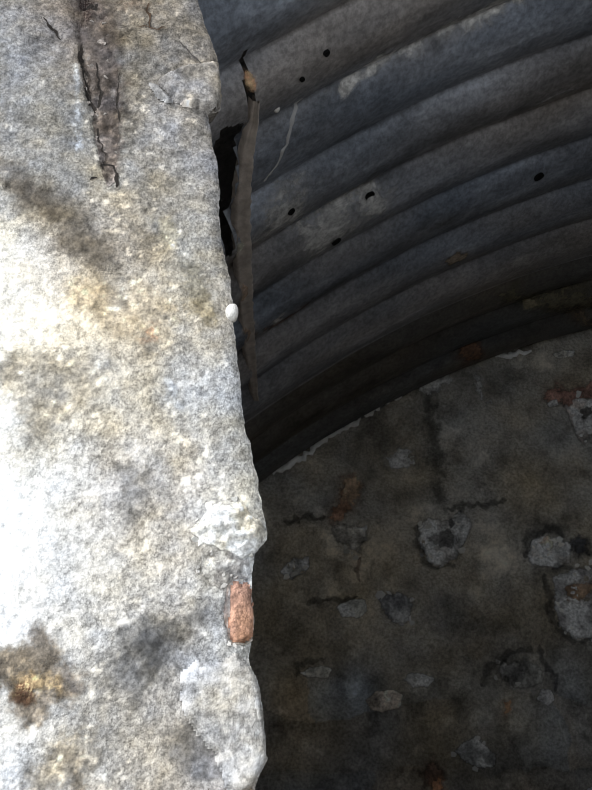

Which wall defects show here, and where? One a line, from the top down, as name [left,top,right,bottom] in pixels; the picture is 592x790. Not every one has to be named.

leakage [73,65,81,151]
crack [43,3,120,187]
flaking render [544,381,592,443]
flaking render [417,512,471,567]
flaking render [528,535,592,641]